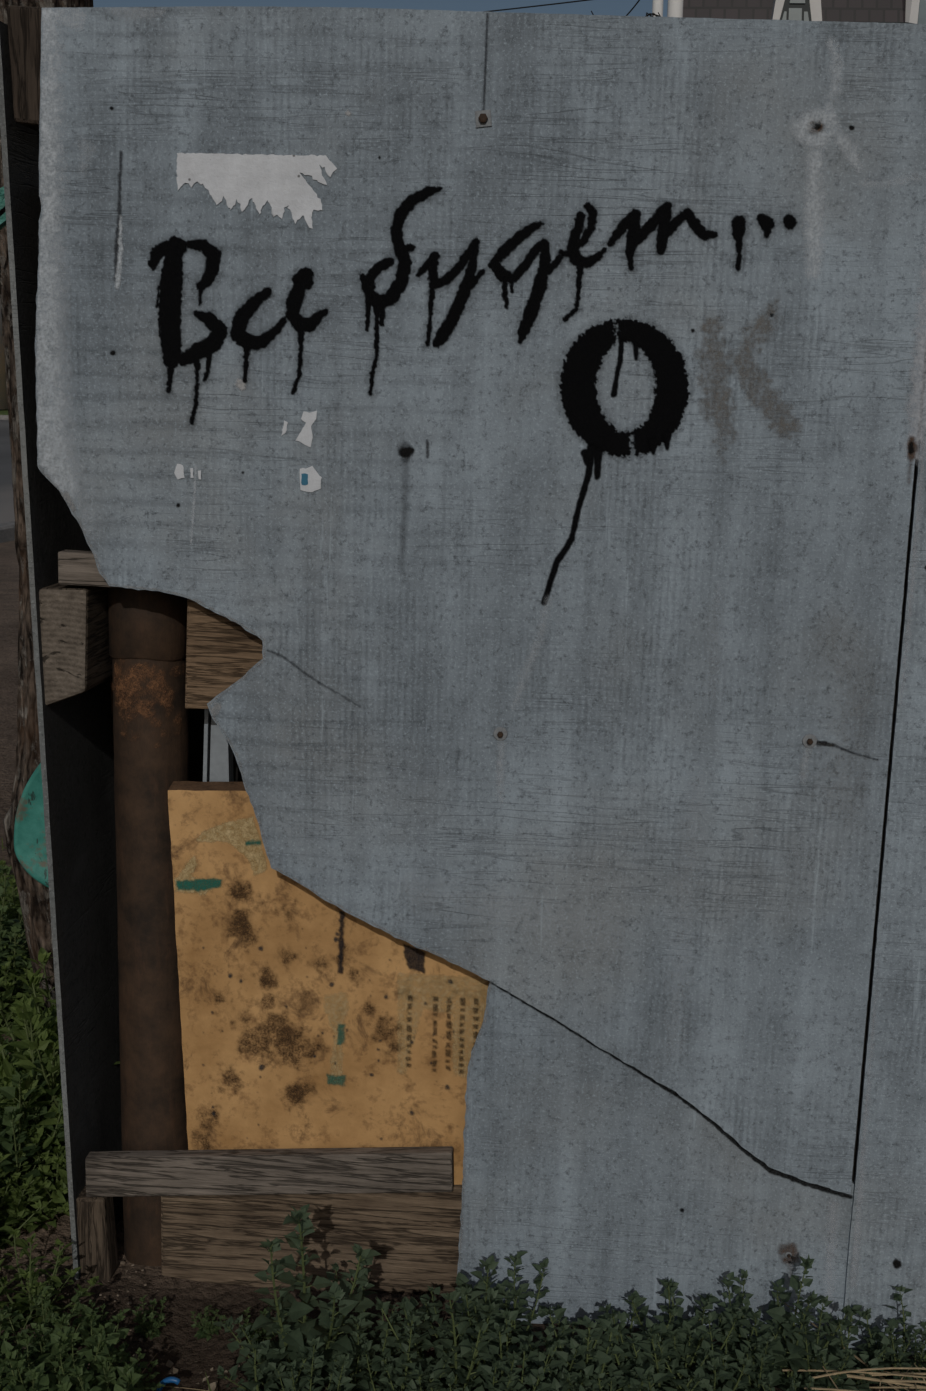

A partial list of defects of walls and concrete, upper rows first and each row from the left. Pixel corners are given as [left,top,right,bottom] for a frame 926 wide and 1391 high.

corrosion [112,664,181,723]
crack [488,981,853,1199]